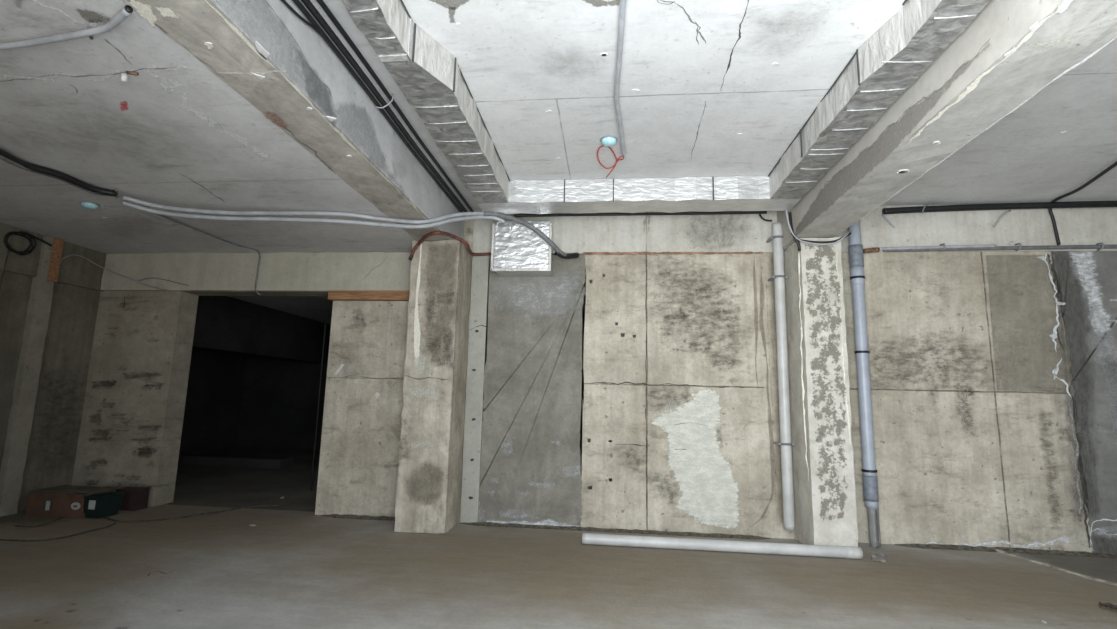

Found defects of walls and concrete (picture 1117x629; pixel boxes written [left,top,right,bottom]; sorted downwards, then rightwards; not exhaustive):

peeling [129,0,179,31]
peeling [205,0,439,231]
crack [657,0,706,45]
crack [691,0,749,159]
peeling [409,243,456,398]
leakage [668,274,735,362]
peeling [798,244,851,520]